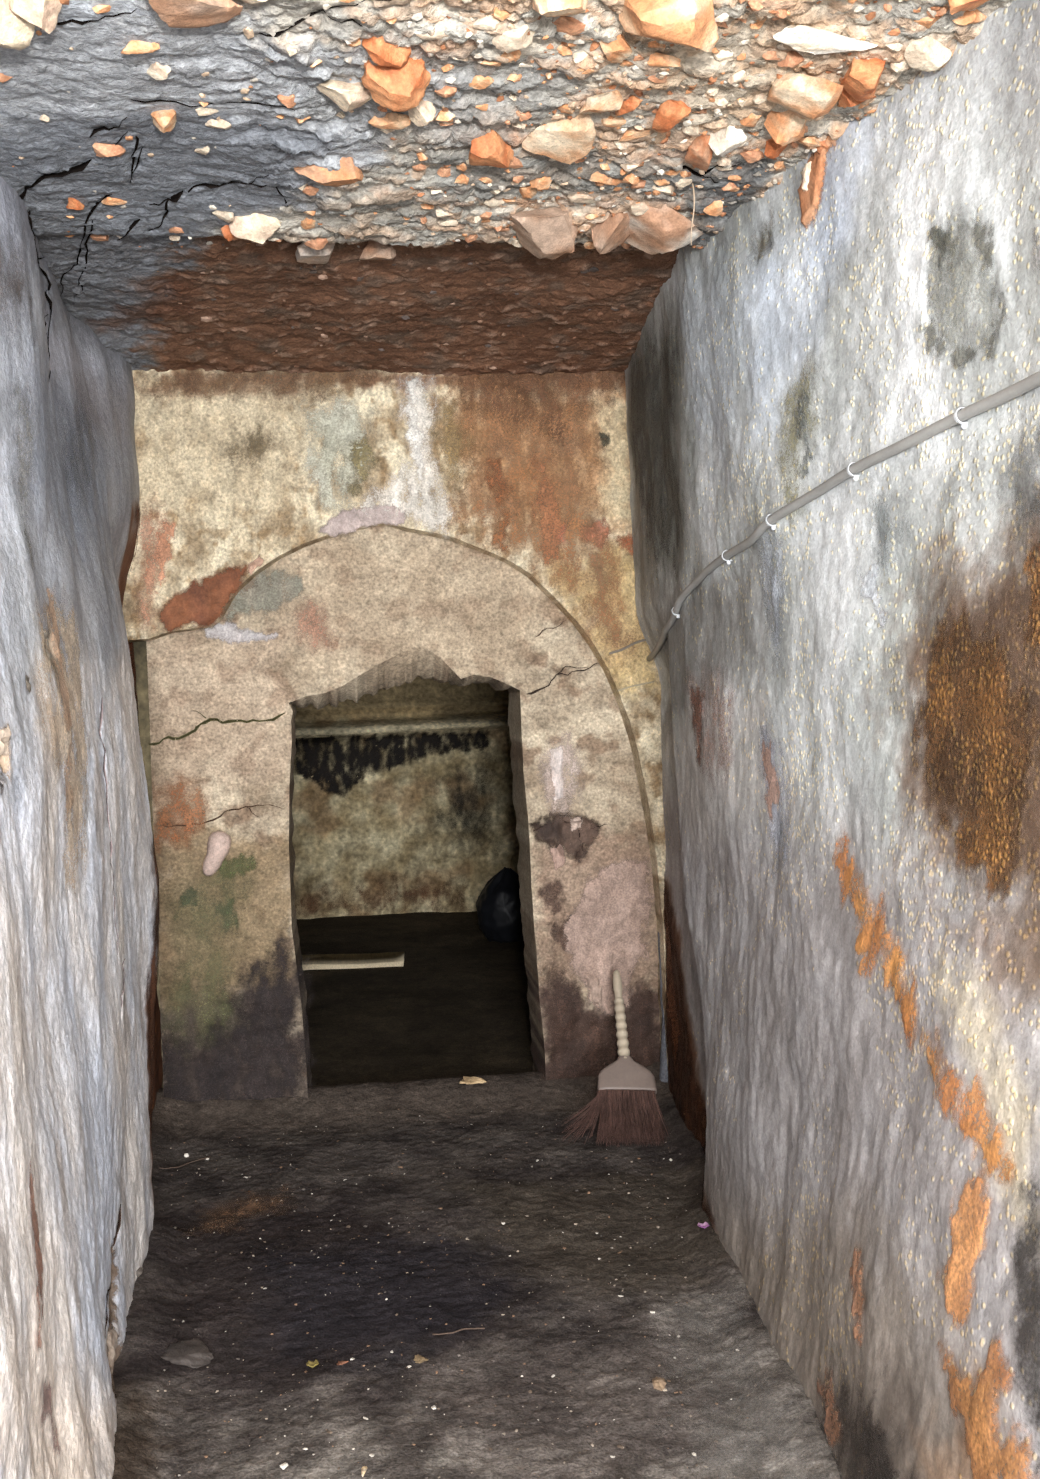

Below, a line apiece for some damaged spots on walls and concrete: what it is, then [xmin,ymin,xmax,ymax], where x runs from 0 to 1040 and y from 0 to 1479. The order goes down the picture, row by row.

crack [19,99,294,379]
water stain [922,218,1000,368]
water stain [152,340,680,567]
spalling [159,556,278,644]
spalling [0,725,11,794]
crack [149,710,285,746]
crack [527,663,599,695]
spalling [530,734,600,870]
peeling [564,857,654,1016]
corrosion [833,836,1013,1326]
corrosion [849,1246,864,1346]
corrosion [938,1340,1031,1479]